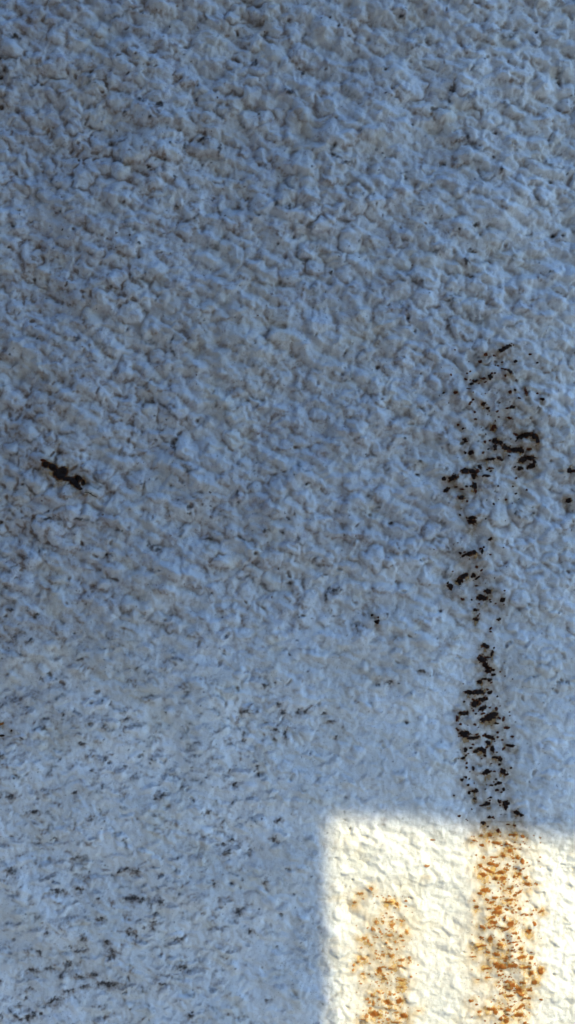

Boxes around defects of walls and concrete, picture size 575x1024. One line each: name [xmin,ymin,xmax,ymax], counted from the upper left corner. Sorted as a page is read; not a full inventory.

rust [40,459,86,493]
rust [442,343,545,530]
rust [447,537,545,1024]
rust [352,887,421,1024]